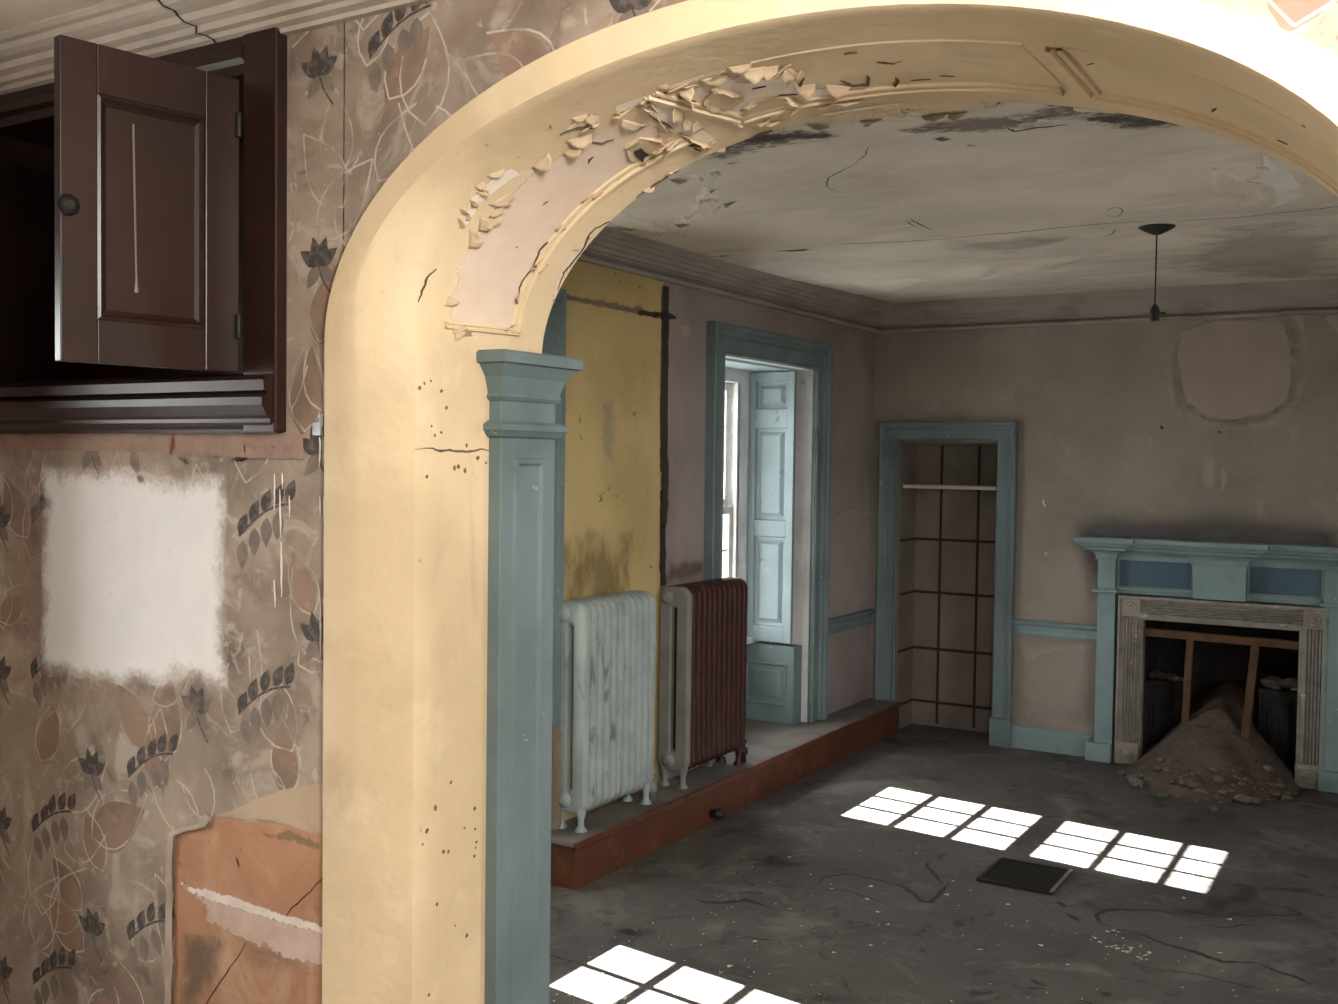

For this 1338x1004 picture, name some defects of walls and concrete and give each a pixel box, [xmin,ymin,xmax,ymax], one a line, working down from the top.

crack [157,0,217,44]
water stain [900,105,1177,146]
peeling [445,63,1003,340]
crack [418,446,489,454]
flaking render [174,783,323,1004]
crack [286,878,323,916]
crack [206,943,246,1004]